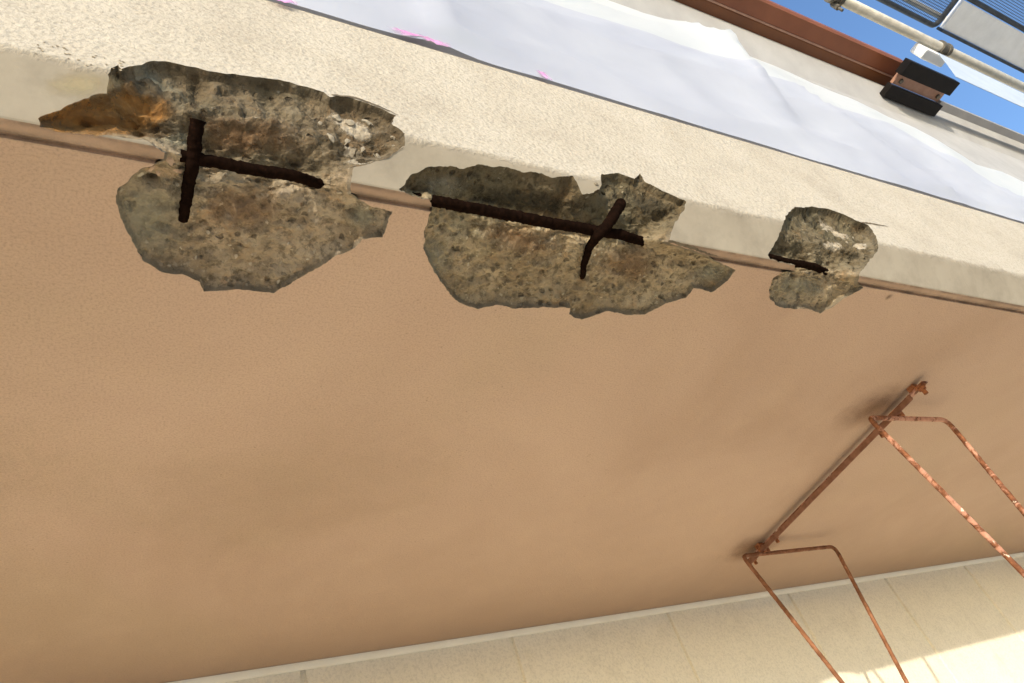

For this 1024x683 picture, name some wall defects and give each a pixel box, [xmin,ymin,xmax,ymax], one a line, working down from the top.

corrosion [39,97,141,136]
spalling [35,42,405,293]
spalling [399,164,735,319]
spalling [768,206,878,313]